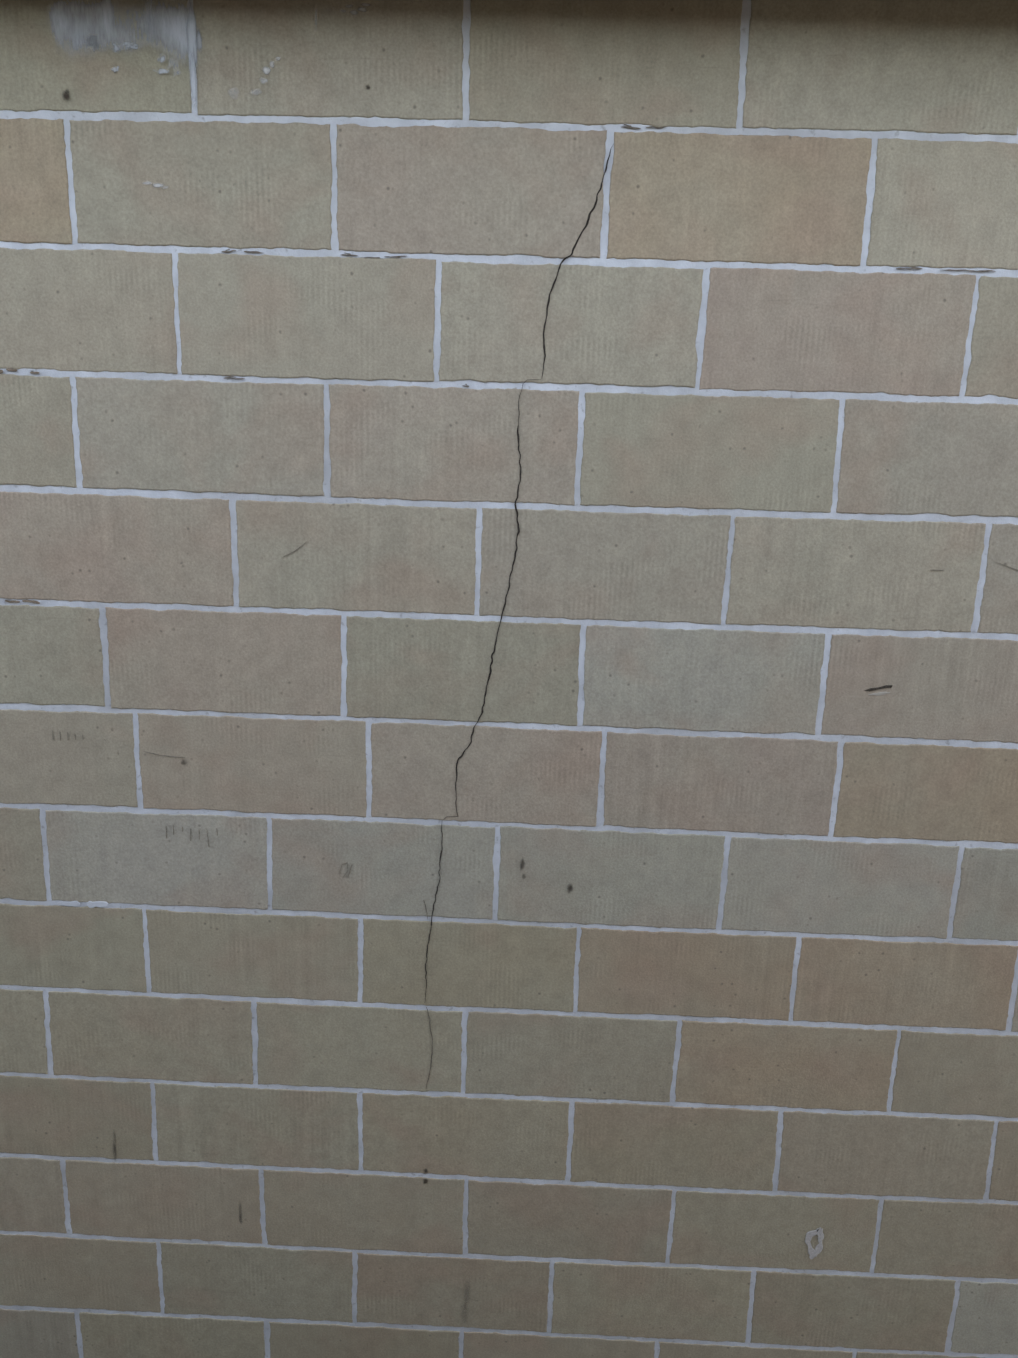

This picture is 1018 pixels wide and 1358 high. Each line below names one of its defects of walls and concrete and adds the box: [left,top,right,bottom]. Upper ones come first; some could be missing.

crack [424,144,614,1086]